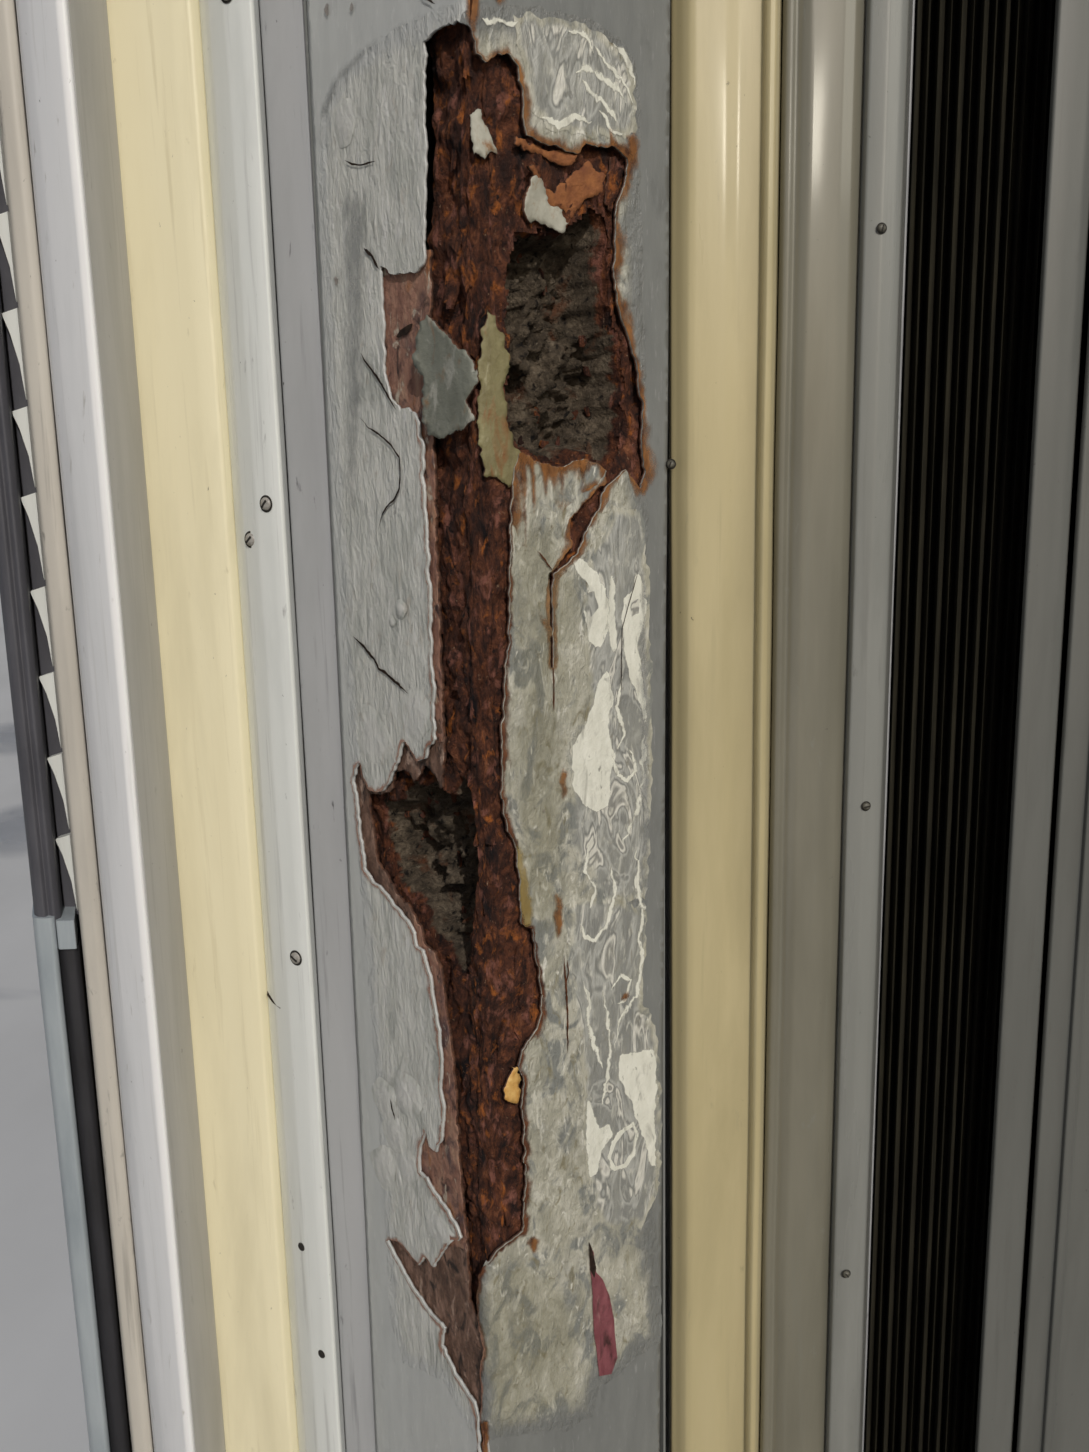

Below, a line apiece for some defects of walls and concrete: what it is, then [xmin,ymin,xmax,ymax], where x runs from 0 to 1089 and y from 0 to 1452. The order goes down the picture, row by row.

peeling [482,11,637,139]
peeling [522,175,568,234]
crack [361,354,401,525]
crack [354,637,407,693]
rust [350,0,654,1452]
crack [550,668,558,706]
peeling [355,249,484,1427]
peeling [568,507,663,1231]
spalling [589,1243,617,1376]